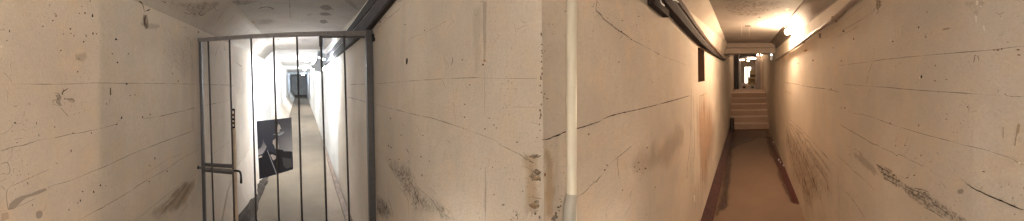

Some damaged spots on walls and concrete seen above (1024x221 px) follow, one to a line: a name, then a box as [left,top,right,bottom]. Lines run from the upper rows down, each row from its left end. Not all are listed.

crack [543,93,724,140]
crack [0,88,120,212]
crack [945,181,1024,210]